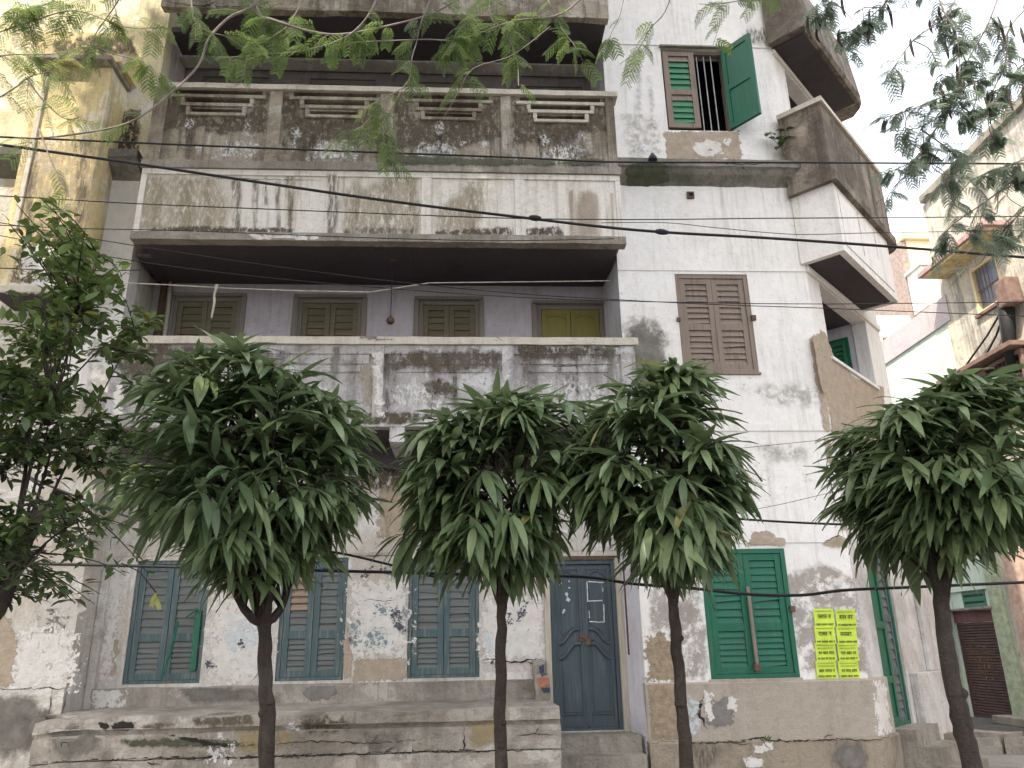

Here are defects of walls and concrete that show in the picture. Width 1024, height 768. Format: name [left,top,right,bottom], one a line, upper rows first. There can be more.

water stain [370,133,606,166]
spalling [663,130,743,159]
water stain [139,177,294,233]
water stain [344,179,418,233]
water stain [331,347,340,377]
water stain [353,349,502,425]
water stain [517,345,616,395]
water stain [626,321,665,390]
peeling [748,530,786,546]
peeling [0,558,167,731]
peeling [336,566,417,683]
spalling [643,579,740,740]